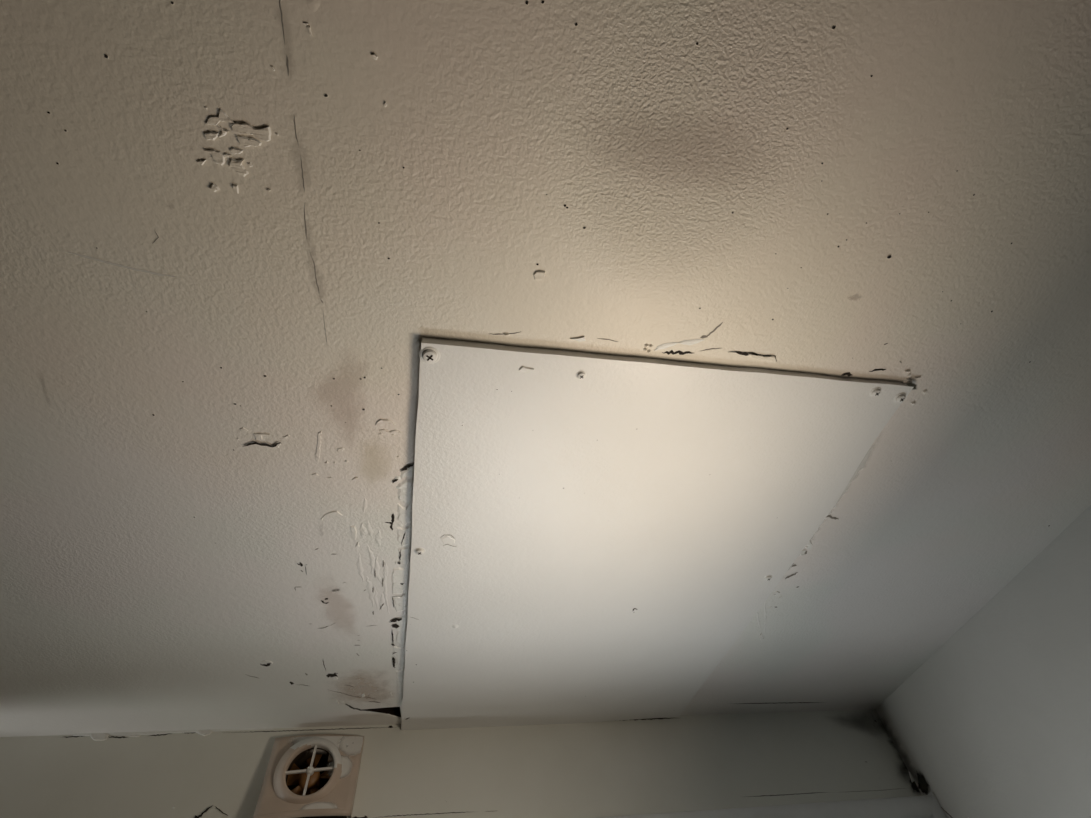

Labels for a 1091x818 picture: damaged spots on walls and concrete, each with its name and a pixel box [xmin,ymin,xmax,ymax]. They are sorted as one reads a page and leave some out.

crack [279,0,289,75]
peeling [197,107,279,194]
crack [294,117,327,342]
peeling [734,352,777,363]
flaking render [902,369,927,405]
peeling [233,427,290,450]
damp [908,771,929,795]